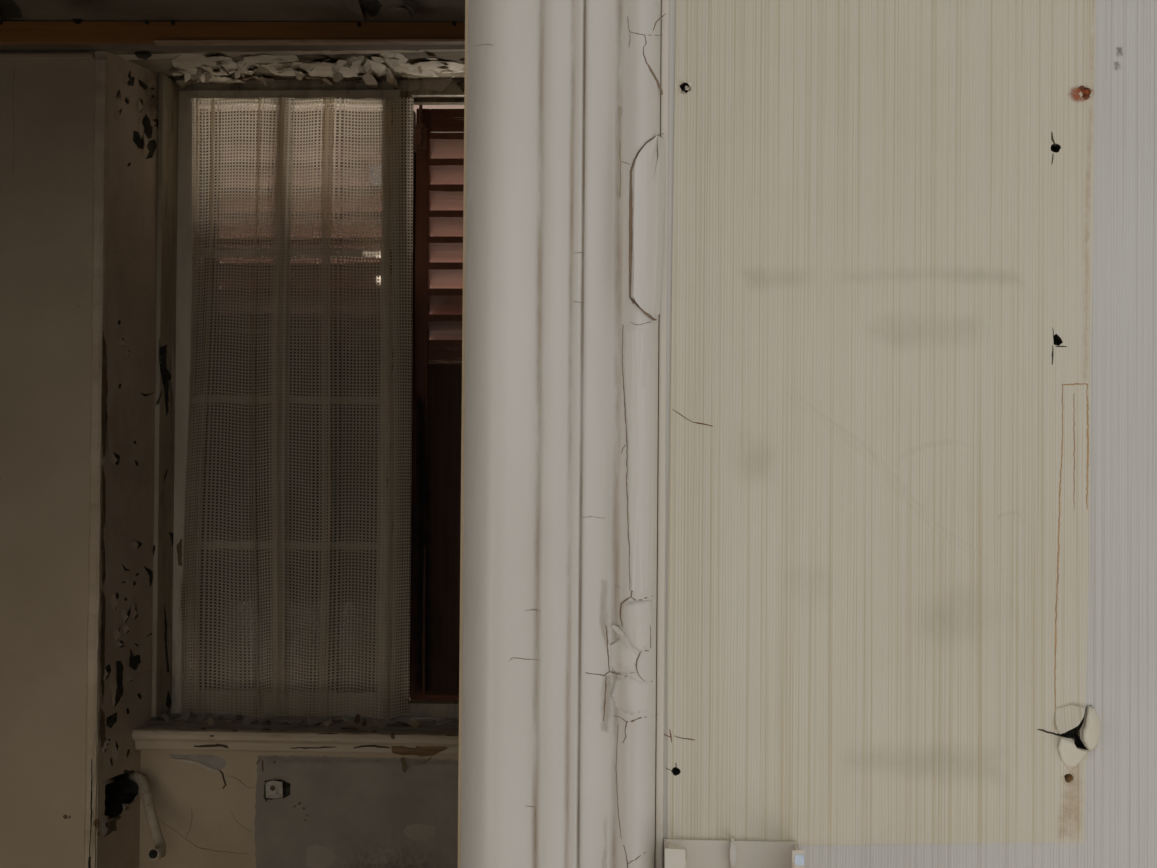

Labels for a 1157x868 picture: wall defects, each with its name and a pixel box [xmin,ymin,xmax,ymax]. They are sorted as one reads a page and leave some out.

peeling [114,49,465,159]
crack [627,13,666,95]
rust [1071,88,1091,100]
peeling [141,333,176,416]
peeling [93,320,155,837]
crack [583,322,657,868]
crack [194,742,229,750]